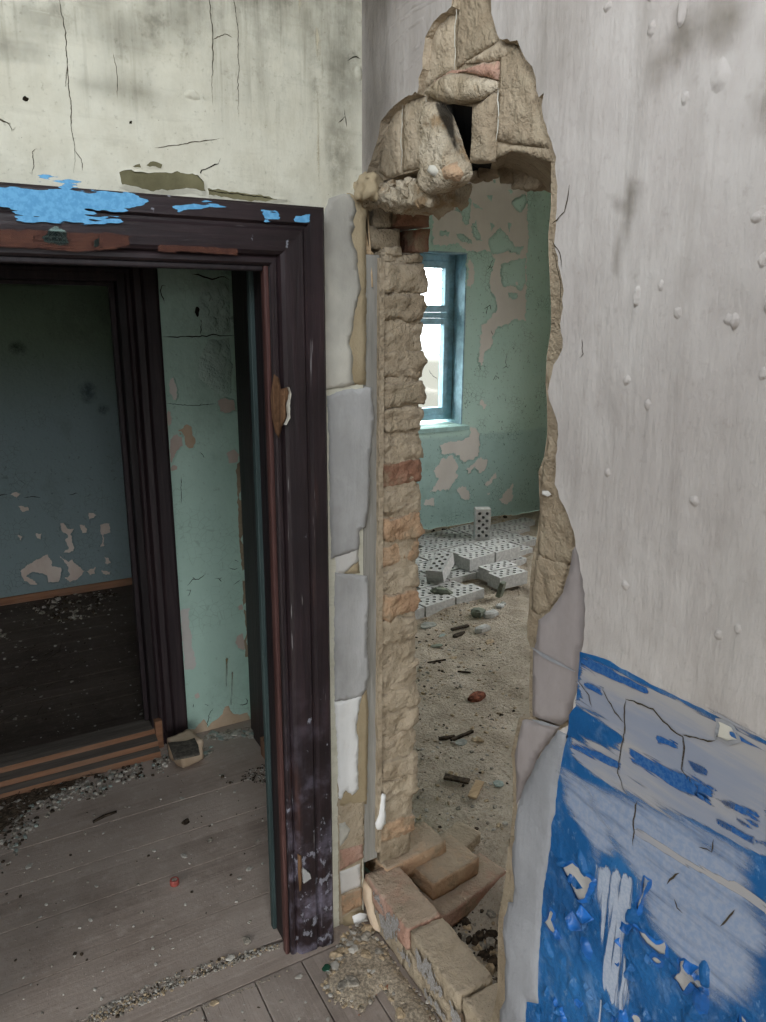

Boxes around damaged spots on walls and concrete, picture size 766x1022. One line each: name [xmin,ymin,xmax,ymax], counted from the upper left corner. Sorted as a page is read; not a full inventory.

crack [59,0,83,169]
crack [209,0,240,106]
peeling [0,160,289,252]
crack [158,138,273,199]
peeling [294,214,310,223]
peeling [167,376,197,472]
peeling [19,512,112,586]
spalling [324,0,553,1022]
peeling [515,435,766,1000]
crack [580,684,712,844]